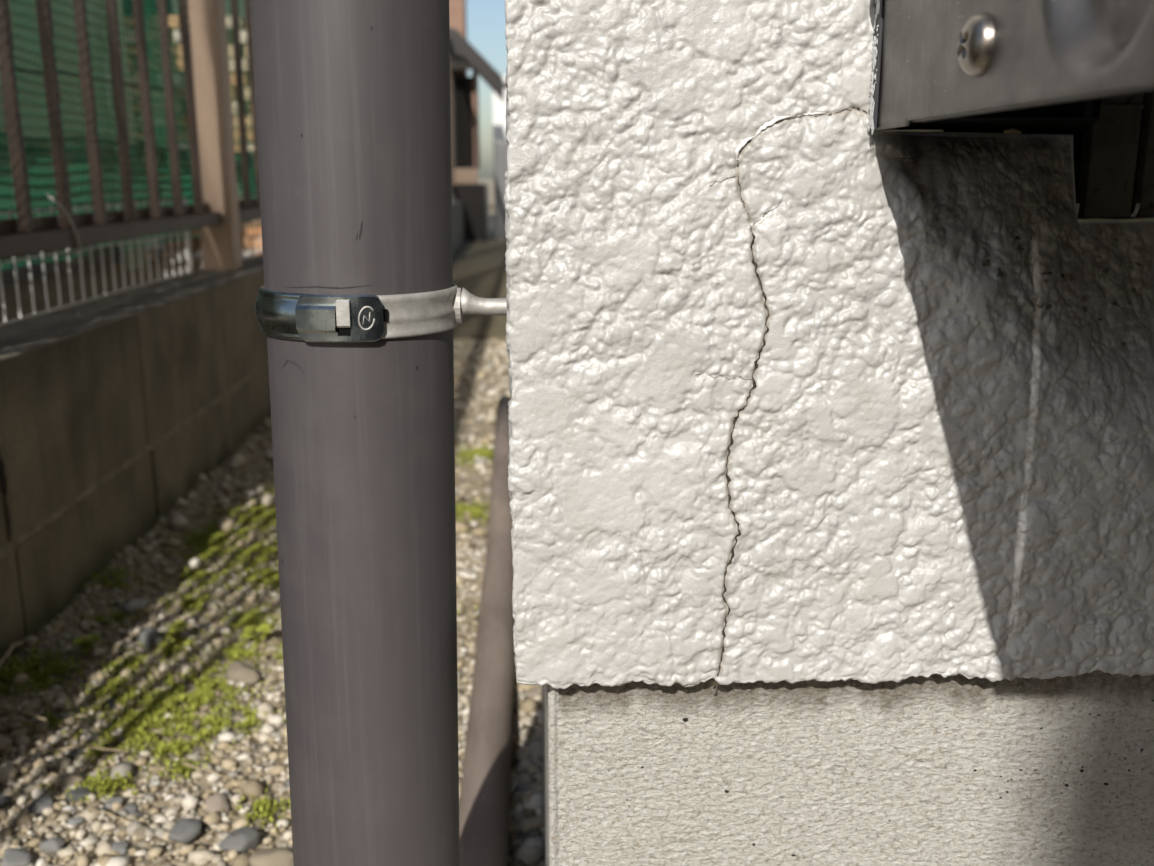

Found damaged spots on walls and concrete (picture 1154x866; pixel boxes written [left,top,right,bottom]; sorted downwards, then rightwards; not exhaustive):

crack [695,107,867,689]